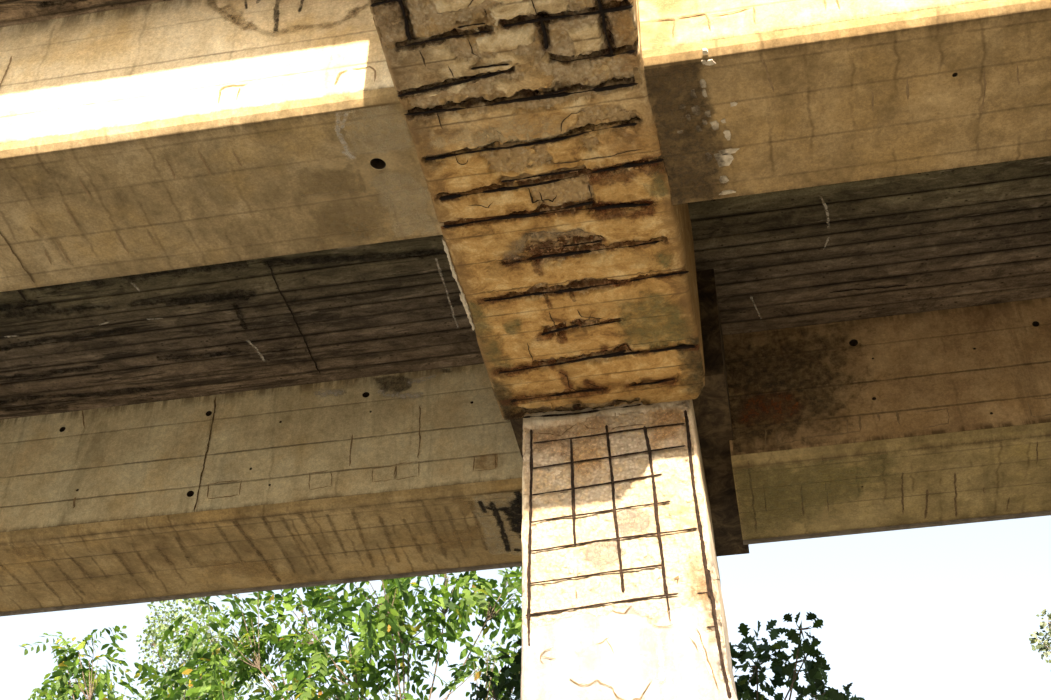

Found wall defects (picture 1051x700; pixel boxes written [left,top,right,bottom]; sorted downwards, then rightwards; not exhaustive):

crack [0,56,12,86]
corrosion [374,0,638,65]
spalling [373,0,640,152]
corrosion [397,66,635,120]
spalling [474,126,594,214]
damp [644,62,724,206]
crack [0,177,93,301]
peeling [442,237,475,330]
corrosion [478,235,686,308]
corrosion [493,344,699,420]
crack [194,397,242,512]
spalling [475,398,733,700]